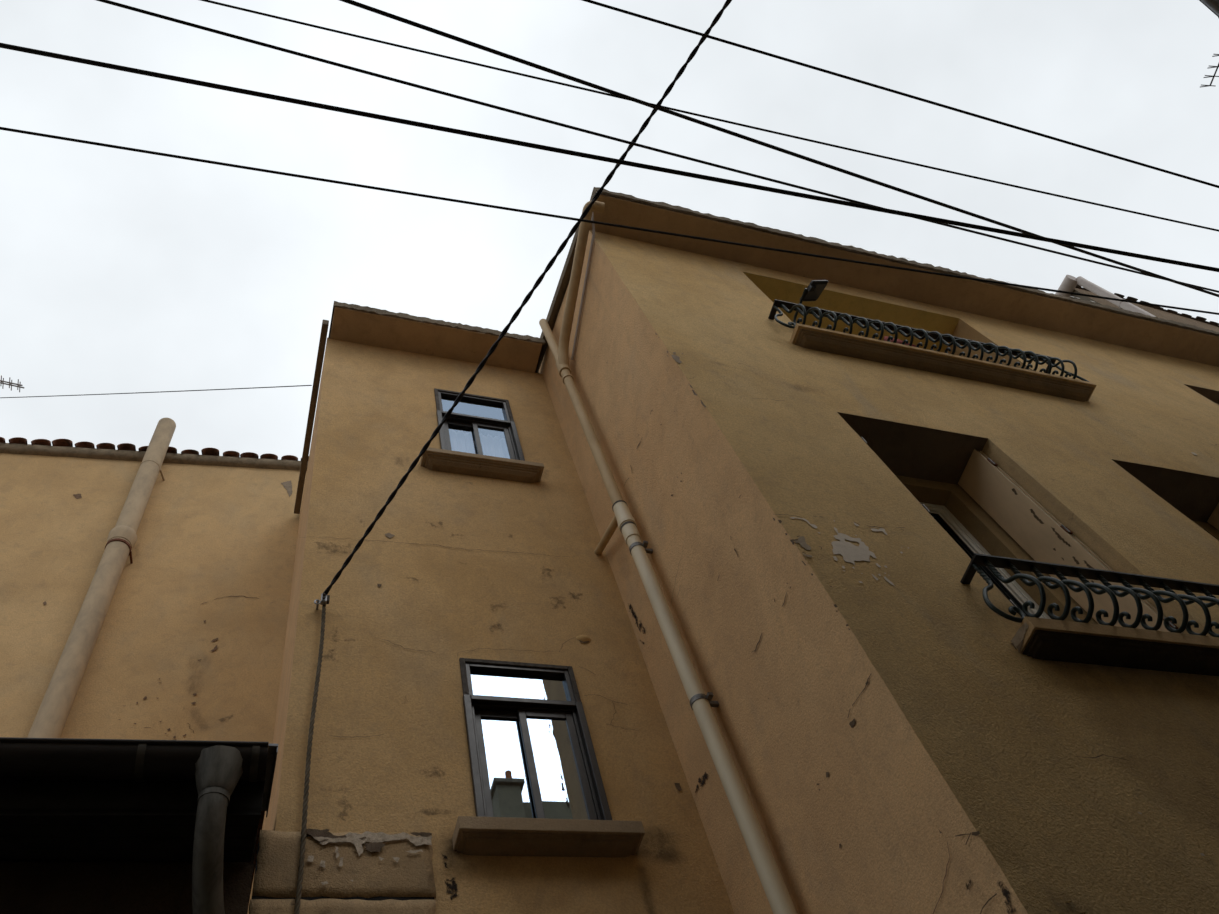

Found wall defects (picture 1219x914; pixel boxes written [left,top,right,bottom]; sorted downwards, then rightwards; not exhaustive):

peeling [772,514,905,586]
flaking render [306,828,385,852]